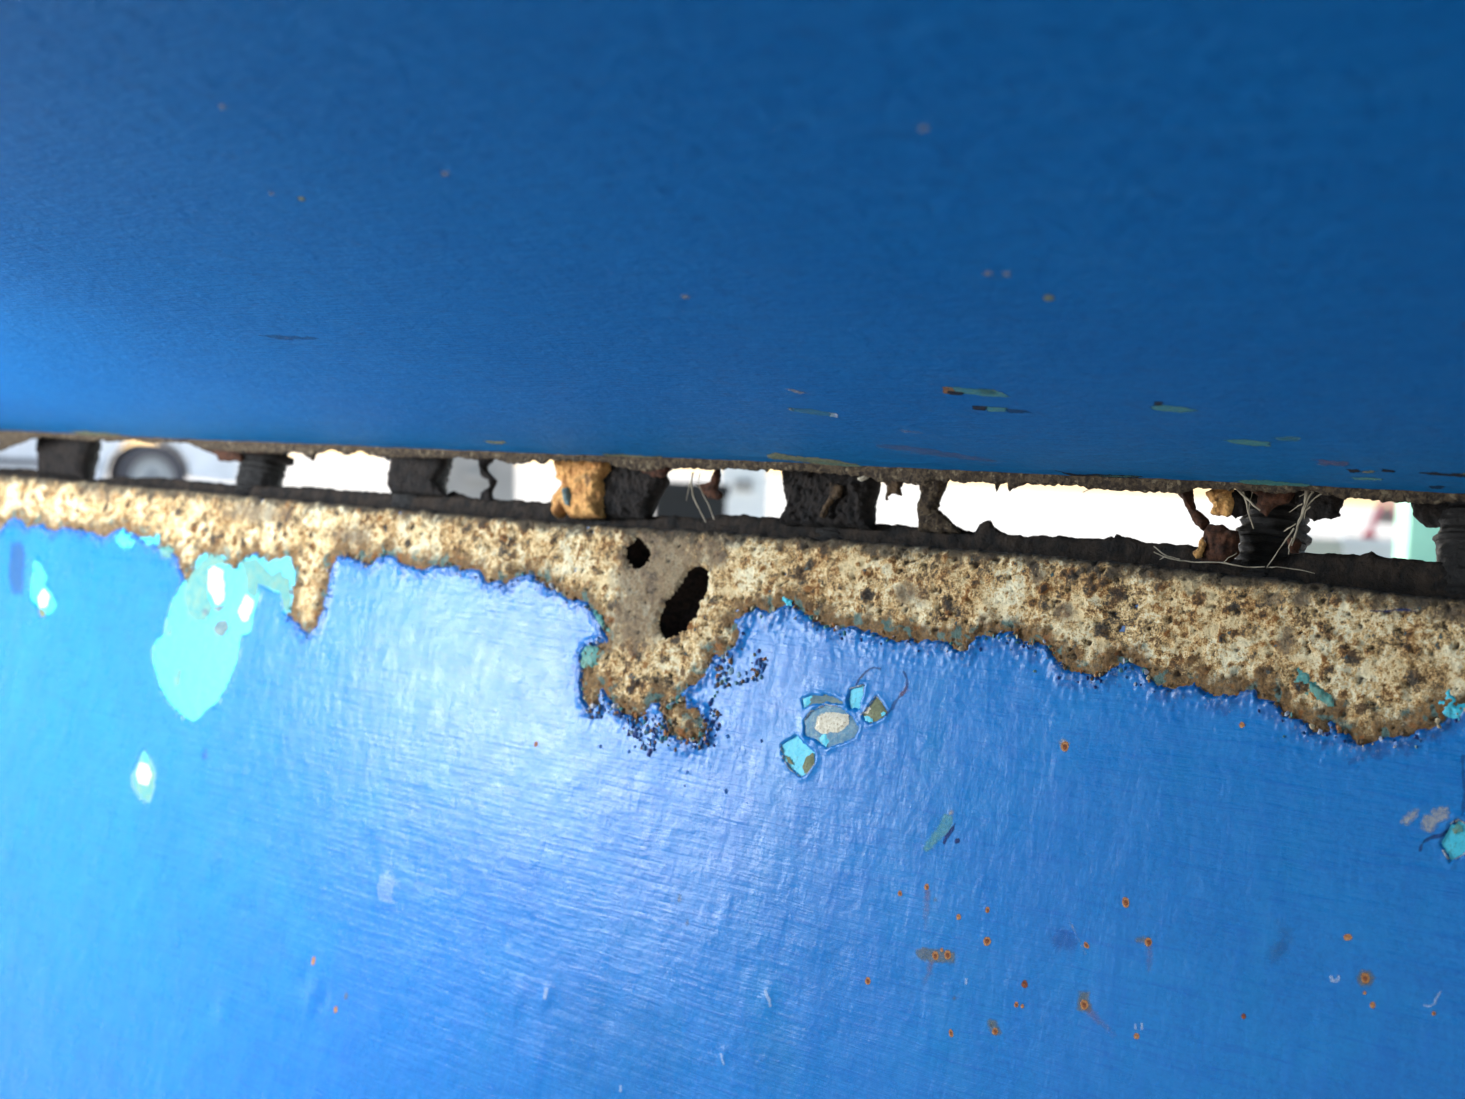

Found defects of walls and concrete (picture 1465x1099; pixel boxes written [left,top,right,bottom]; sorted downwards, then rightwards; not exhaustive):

peeling [767,453,862,467]
peeling [115,528,174,559]
peeling [31,560,57,617]
rust [0,430,1465,757]
peeling [153,553,295,721]
peeling [1292,667,1334,707]
peeling [1438,689,1465,720]
peeling [780,684,888,777]
peeling [132,750,156,803]
peeling [1442,819,1465,860]
rust [932,948,951,960]
rust [1361,973,1375,1008]